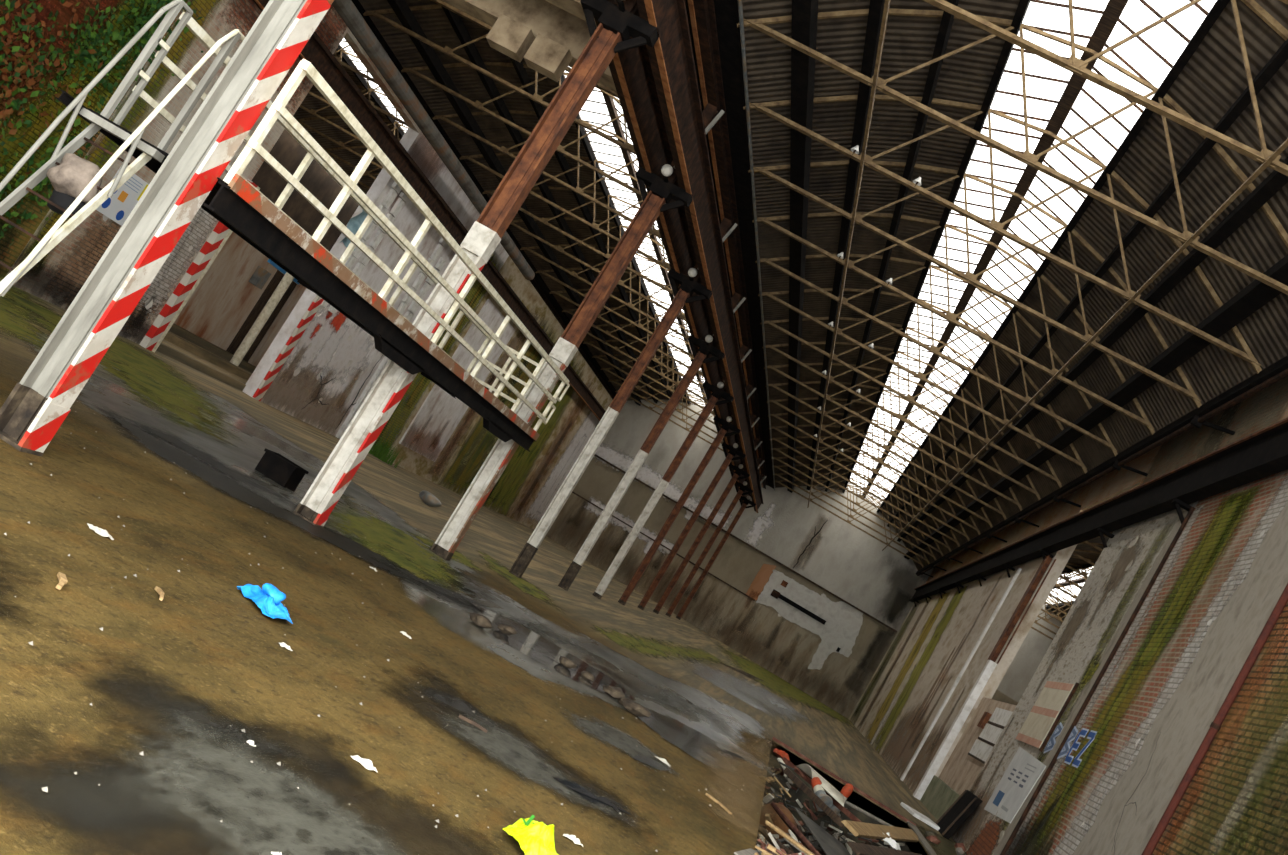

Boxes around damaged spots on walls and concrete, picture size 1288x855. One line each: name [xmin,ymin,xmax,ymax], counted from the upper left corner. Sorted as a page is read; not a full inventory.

leakage [19,331,50,355]
rust [310,311,347,339]
leakage [78,361,775,775]
flaking render [756,570,863,670]
leakage [720,570,918,705]
leakage [870,648,965,793]
leakage [1006,475,1288,855]
leakage [951,756,1004,855]